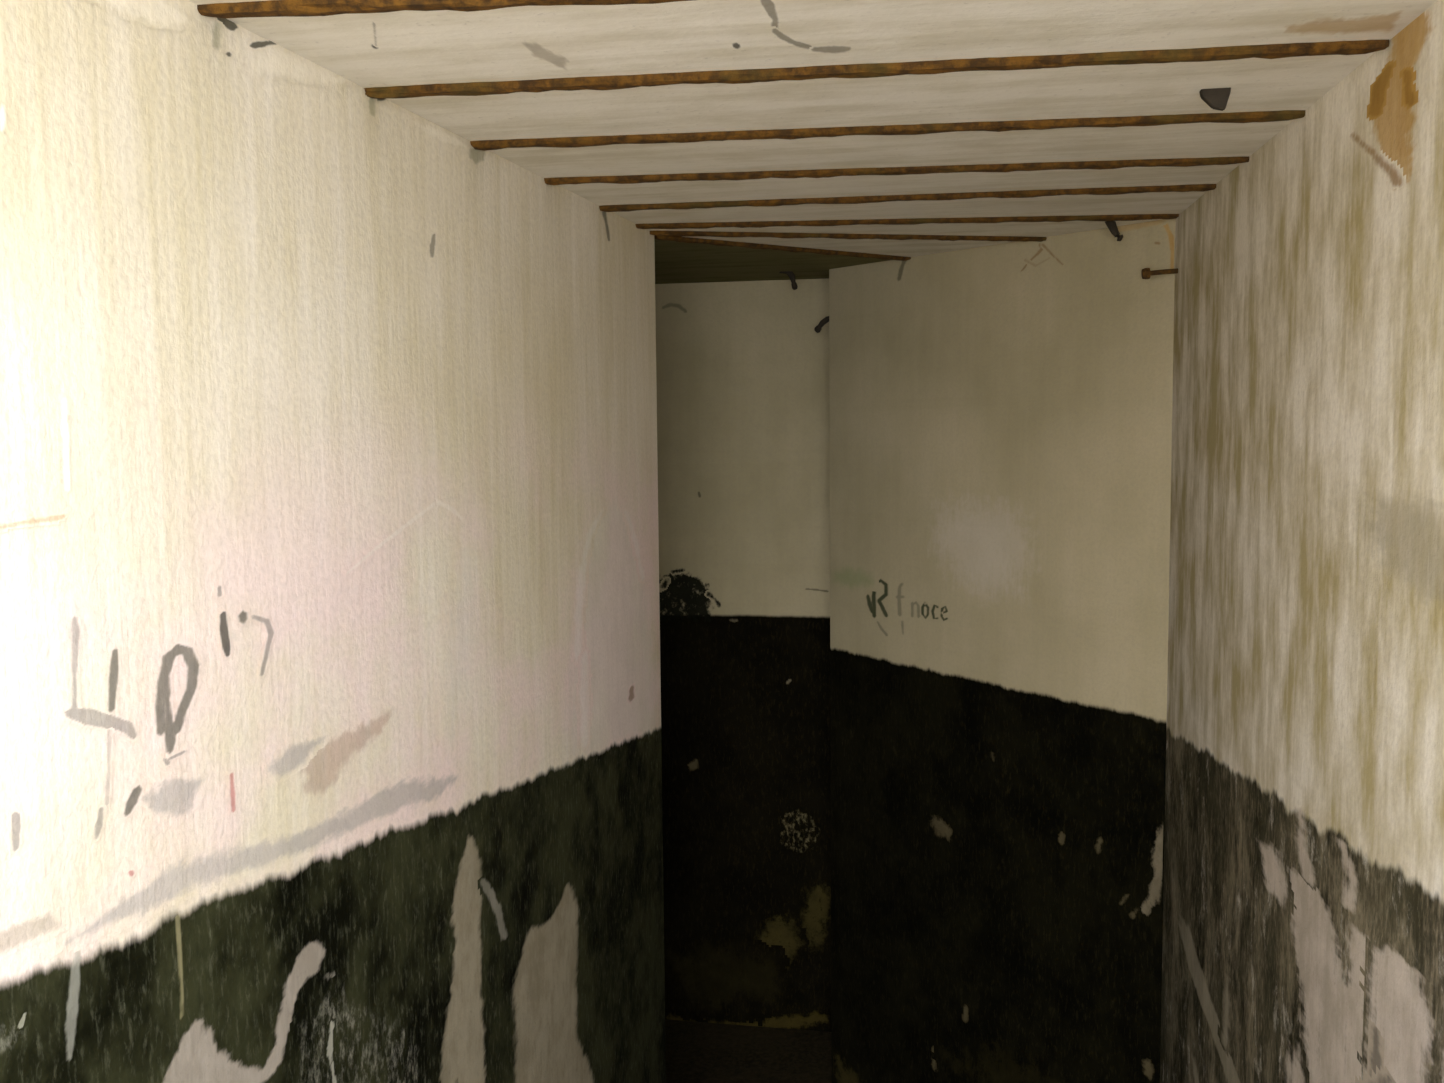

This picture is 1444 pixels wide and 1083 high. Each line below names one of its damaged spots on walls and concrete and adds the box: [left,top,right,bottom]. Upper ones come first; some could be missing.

water stain [1340,477,1444,627]
peeling [0,1010,37,1059]
peeling [158,831,598,1083]
peeling [1116,817,1242,1083]
peeling [1254,803,1444,1083]